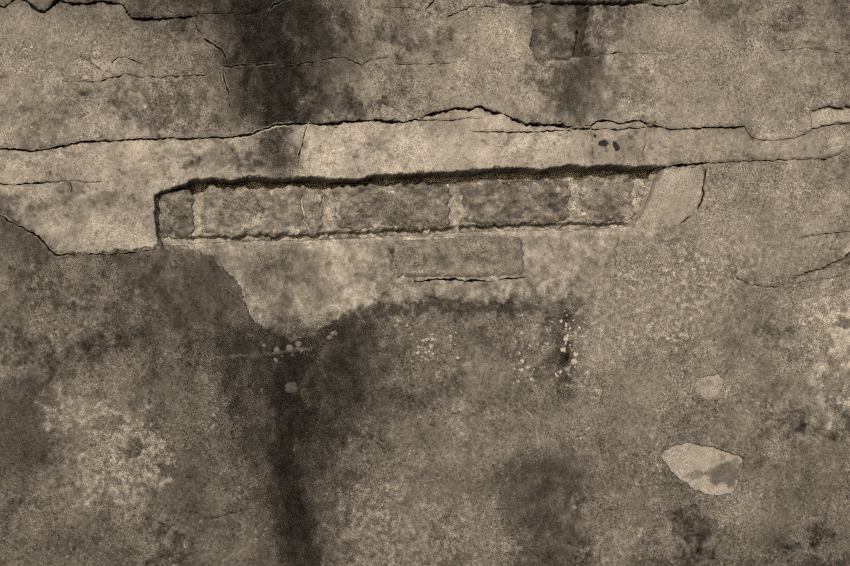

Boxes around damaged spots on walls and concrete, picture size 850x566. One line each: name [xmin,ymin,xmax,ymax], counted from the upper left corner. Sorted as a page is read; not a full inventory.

water stain [232,0,324,161]
crack [0,0,850,225]
crack [0,213,156,258]
flaking render [0,107,850,341]
crack [735,276,793,289]
spalling [661,443,742,495]